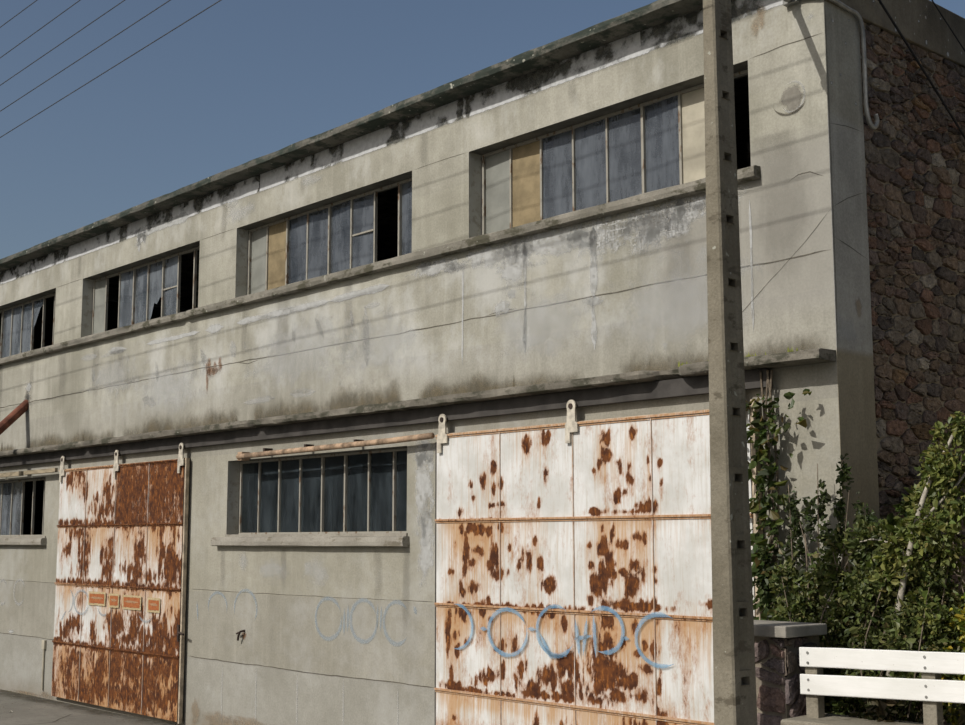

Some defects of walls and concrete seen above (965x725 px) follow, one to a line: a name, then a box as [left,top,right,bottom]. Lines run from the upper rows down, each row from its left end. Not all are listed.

leakage [640,8,703,48]
leakage [731,0,760,22]
peeling [735,0,783,17]
leakage [506,44,612,94]
leakage [386,88,494,146]
peeling [0,10,703,284]